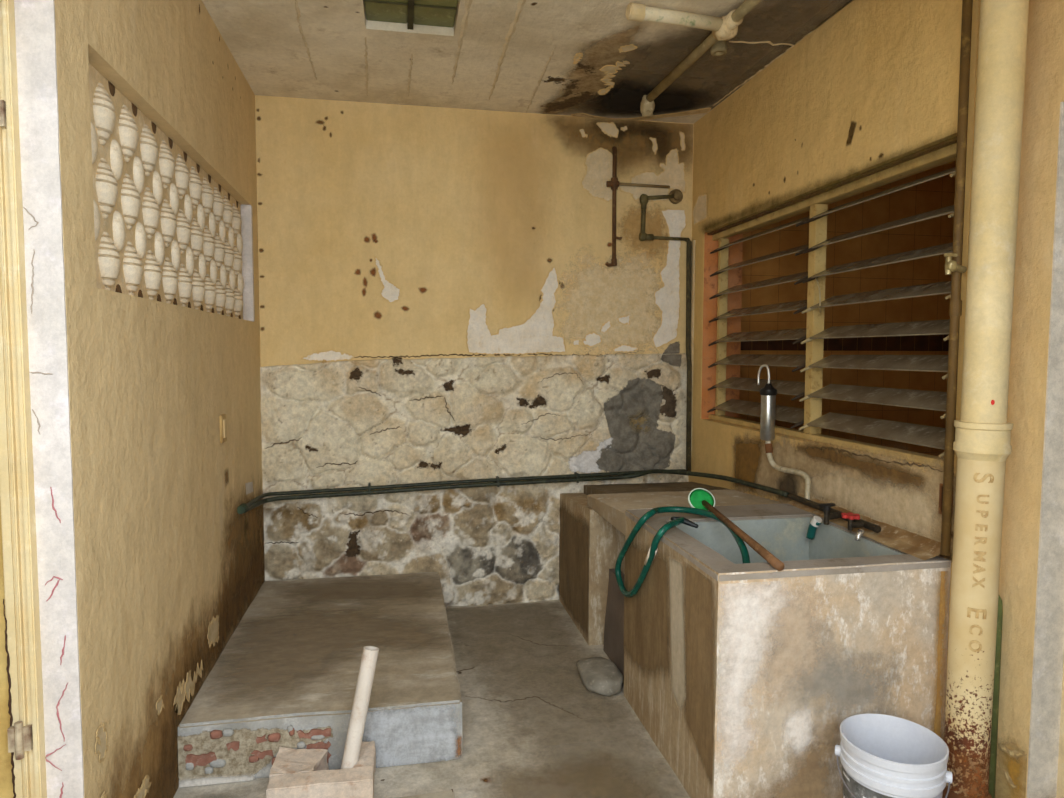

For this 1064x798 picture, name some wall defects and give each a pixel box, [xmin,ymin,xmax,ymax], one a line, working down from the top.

peeling [541,26,711,138]
water stain [847,122,861,145]
water stain [703,135,957,232]
peeling [466,132,707,355]
crack [354,351,638,385]
crack [409,396,455,421]
crack [523,413,592,441]
crack [297,507,410,518]
peeling [207,615,219,648]
water stain [111,496,445,798]
peeling [156,660,203,715]
peeling [134,775,152,798]